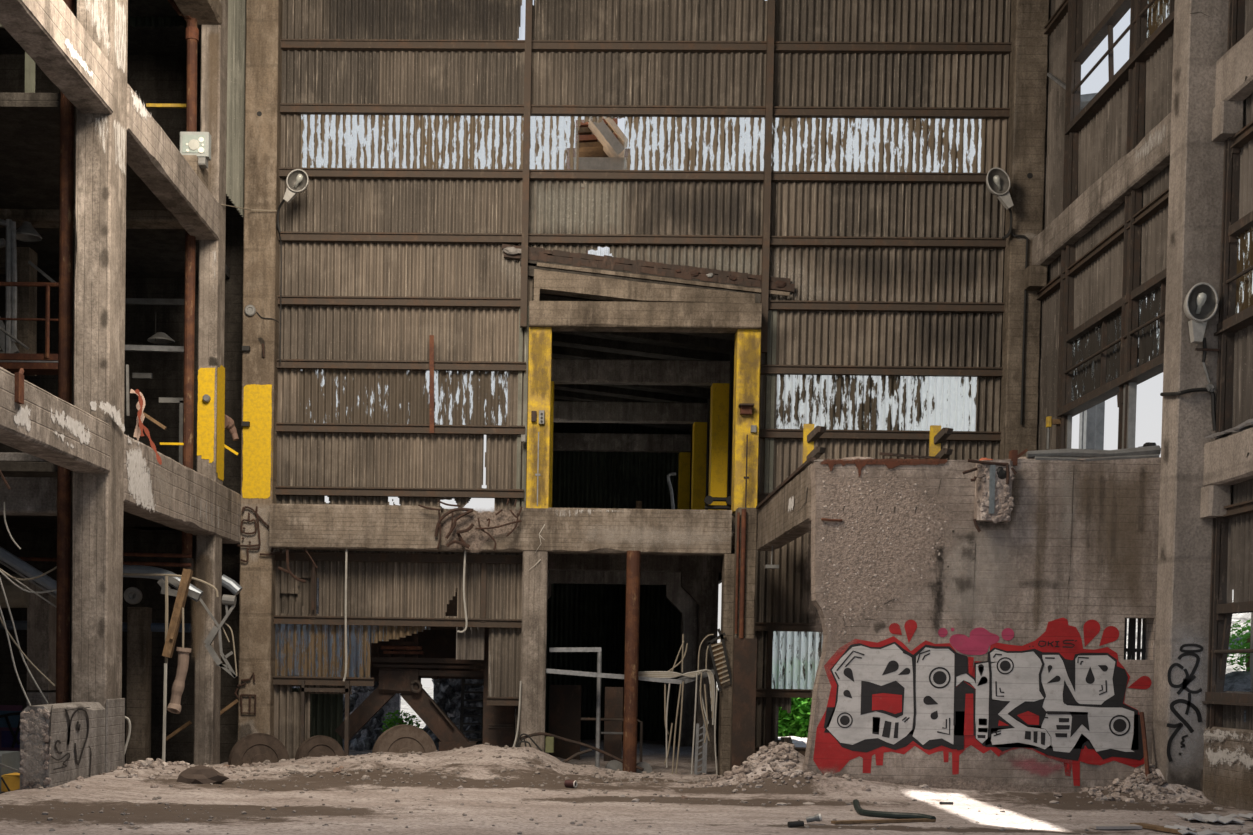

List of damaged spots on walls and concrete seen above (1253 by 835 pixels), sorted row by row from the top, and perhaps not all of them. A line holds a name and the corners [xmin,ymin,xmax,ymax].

peeling [14,405,31,431]
peeling [51,408,92,448]
peeling [90,364,158,512]
rust [821,458,948,477]
damp [932,548,943,629]